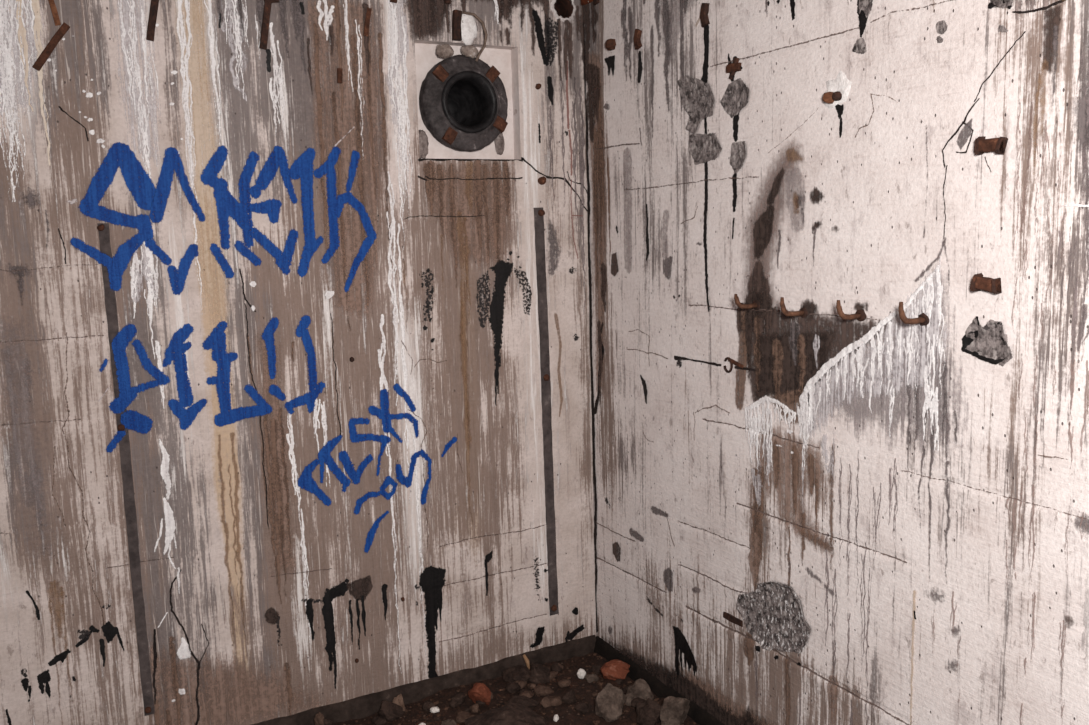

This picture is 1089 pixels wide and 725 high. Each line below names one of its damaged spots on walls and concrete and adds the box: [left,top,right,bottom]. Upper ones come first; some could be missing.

water stain [621,0,633,79]
water stain [643,0,688,138]
spalling [677,75,749,173]
crack [915,31,1026,281]
water stain [1012,0,1089,472]
water stain [176,0,611,669]
spalling [961,316,1013,366]
crack [2,332,209,725]
water stain [744,257,962,698]
water stain [1006,485,1035,578]
water stain [1065,512,1089,556]
spalling [736,582,811,666]